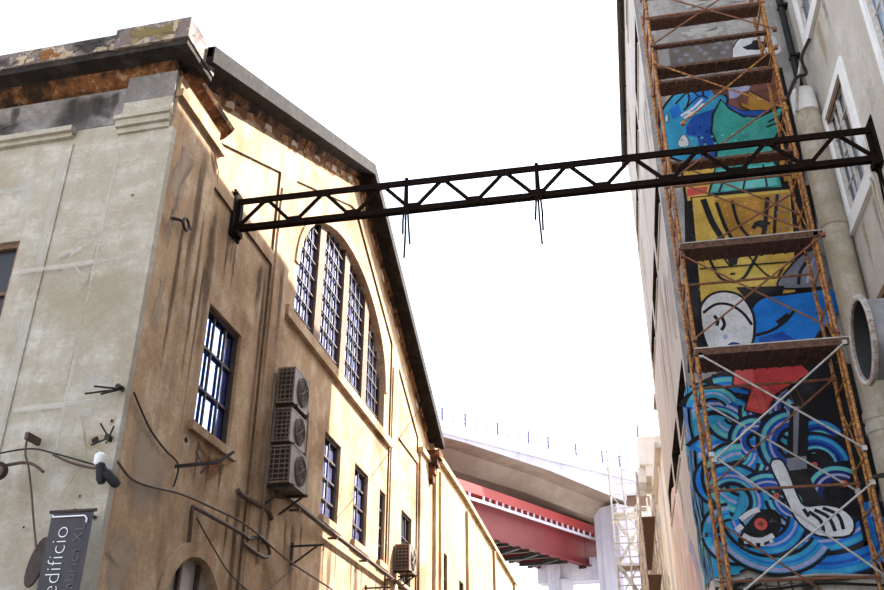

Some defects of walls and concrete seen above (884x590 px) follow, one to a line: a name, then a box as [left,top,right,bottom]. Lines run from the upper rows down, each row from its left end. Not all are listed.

water stain [255,268,265,377]